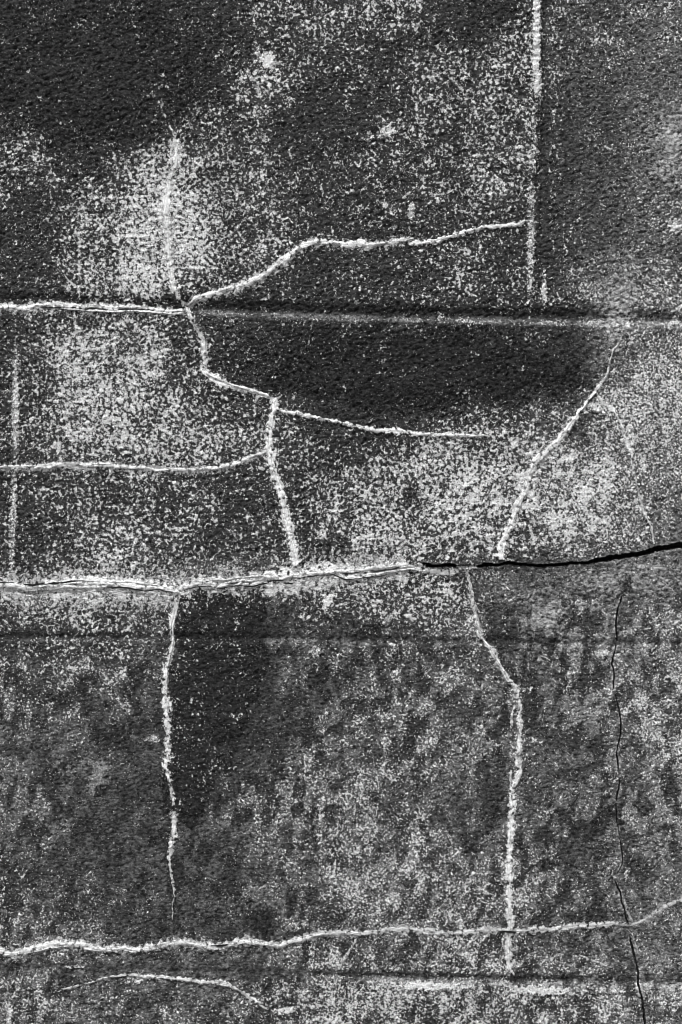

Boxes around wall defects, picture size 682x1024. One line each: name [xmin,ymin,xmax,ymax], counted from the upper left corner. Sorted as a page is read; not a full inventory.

crack [0,122,526,568]
crack [0,334,682,976]
crack [61,973,271,1012]
crack [625,929,651,1024]